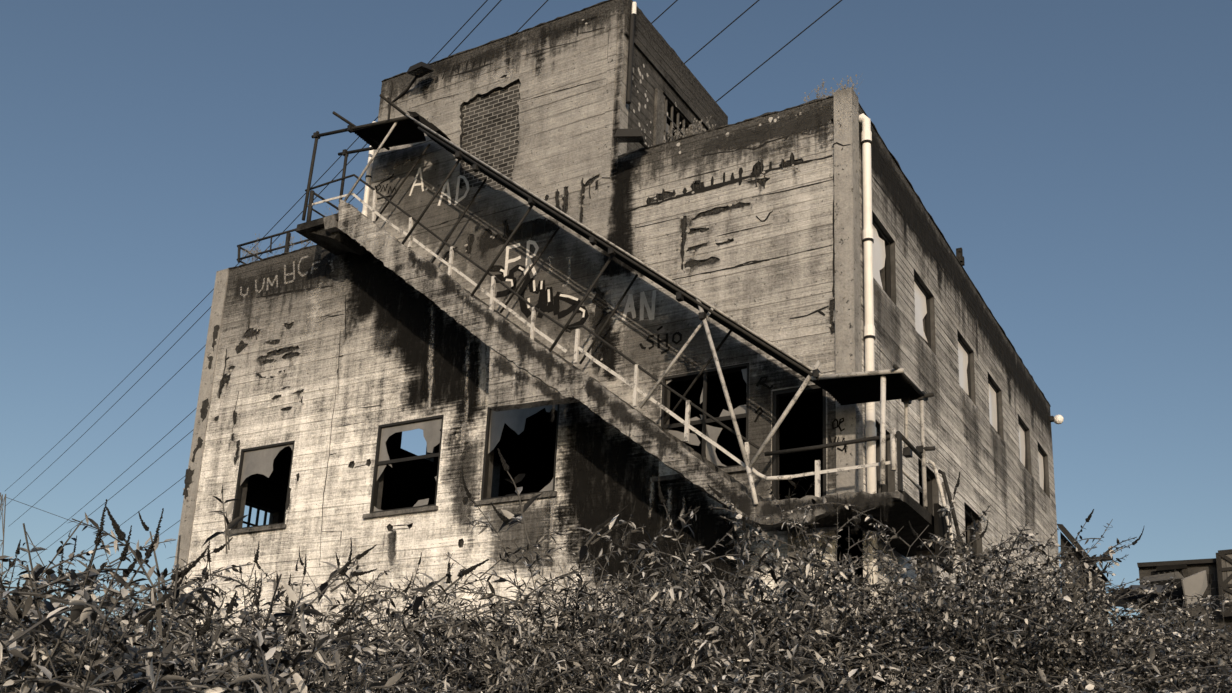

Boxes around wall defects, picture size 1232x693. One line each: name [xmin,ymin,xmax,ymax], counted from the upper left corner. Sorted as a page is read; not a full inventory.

spalling [200,319,305,465]
spalling [182,437,205,499]